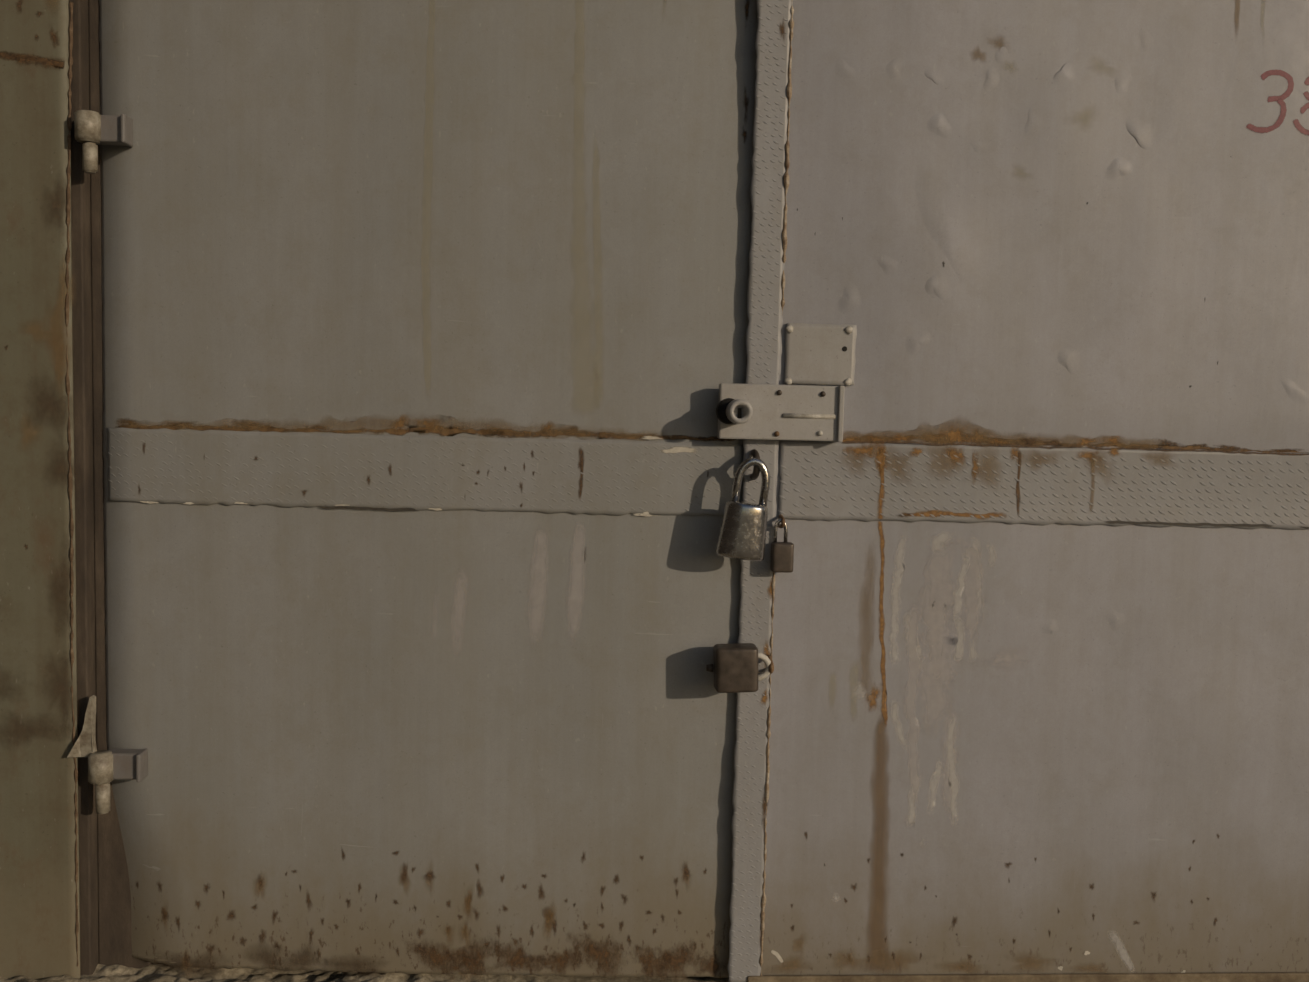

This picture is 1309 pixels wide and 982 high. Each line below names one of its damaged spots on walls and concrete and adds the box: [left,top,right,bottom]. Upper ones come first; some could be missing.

rust [118,417,736,507]
rust [843,429,1309,965]
rust [415,864,725,976]